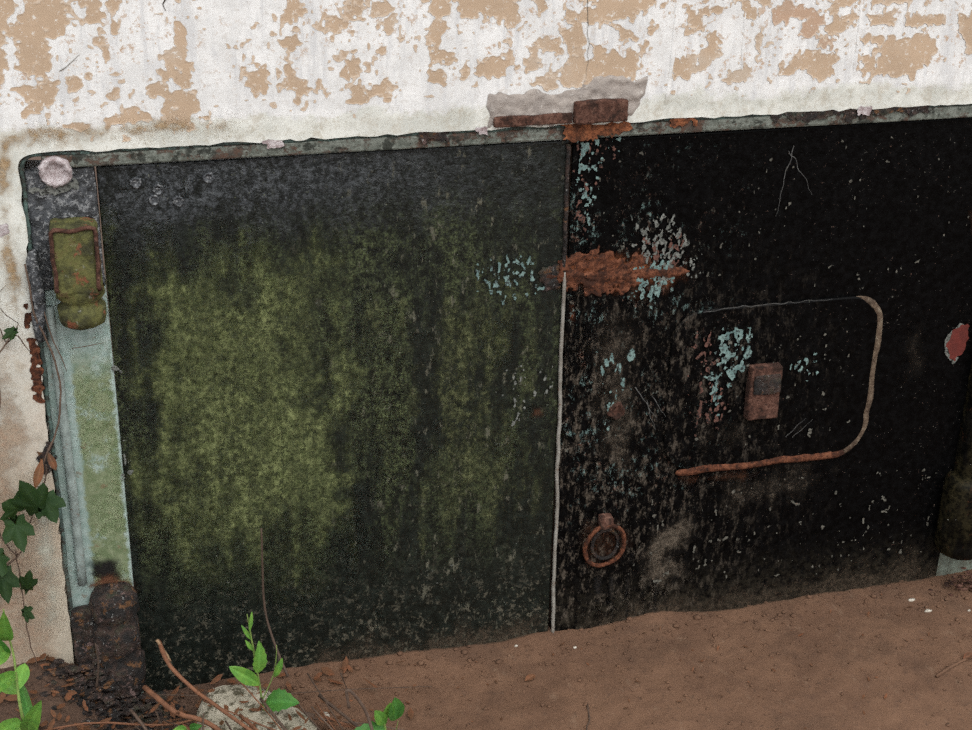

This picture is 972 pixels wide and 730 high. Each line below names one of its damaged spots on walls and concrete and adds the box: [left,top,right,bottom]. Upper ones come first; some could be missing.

peeling [0,0,221,196]
peeling [262,139,284,149]
peeling [572,137,621,248]
rust [562,121,632,143]
spalling [226,0,972,135]
peeling [0,223,20,301]
peeling [612,208,721,309]
peeling [686,327,753,441]
peeling [790,333,853,386]